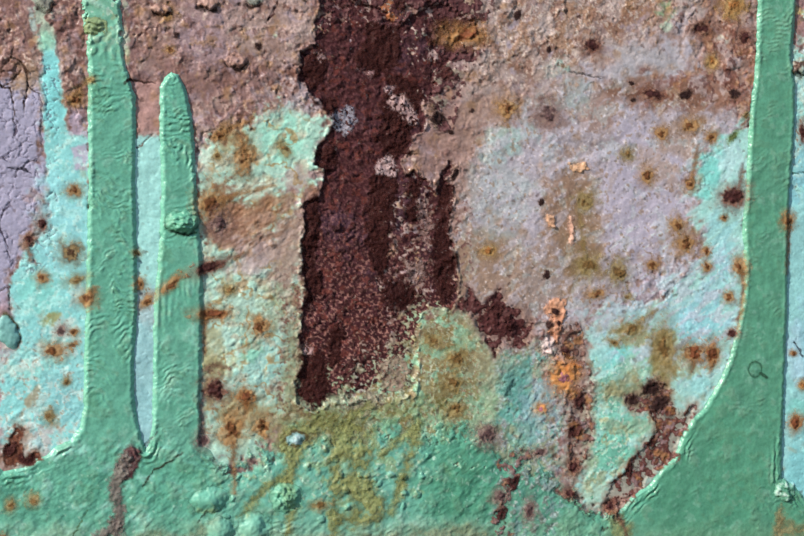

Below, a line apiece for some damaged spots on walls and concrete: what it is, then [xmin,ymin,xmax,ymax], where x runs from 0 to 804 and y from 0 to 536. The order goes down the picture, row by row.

crack [0,47,43,178]
rust [629,81,668,102]
rust [681,119,739,145]
peeling [569,162,589,173]
peeling [297,0,533,419]
rust [719,168,750,222]
rust [25,215,49,284]
rust [61,240,82,263]
rust [669,217,712,273]
rust [78,287,99,308]
rust [44,324,79,361]
peeling [541,298,595,473]